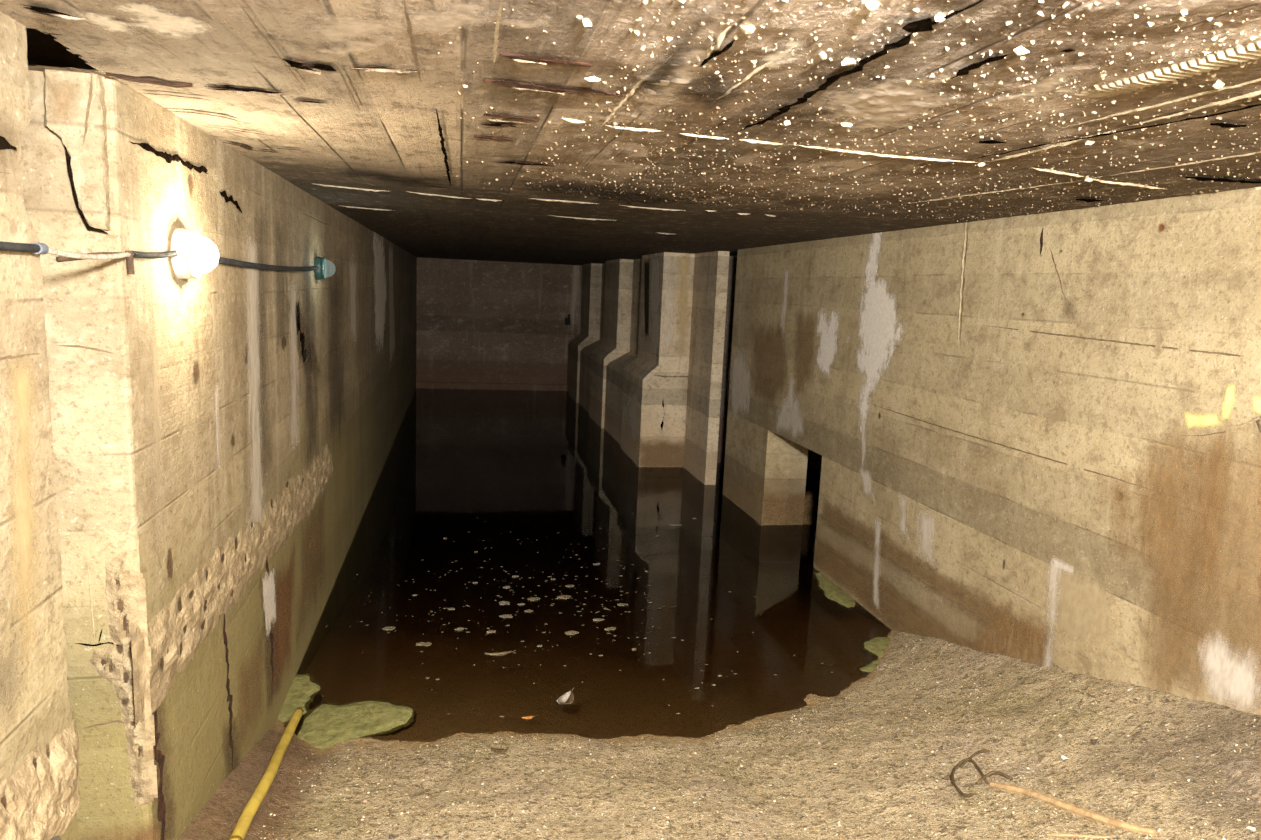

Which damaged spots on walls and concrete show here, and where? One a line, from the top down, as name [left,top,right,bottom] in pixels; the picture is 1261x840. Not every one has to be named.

crack [734,0,983,134]
crack [951,52,1015,79]
crack [0,136,17,173]
crack [131,142,242,213]
crack [144,93,297,154]
leakage [732,232,903,493]
spalling [101,601,132,683]
spalling [178,591,207,630]
leakage [1166,469,1261,703]